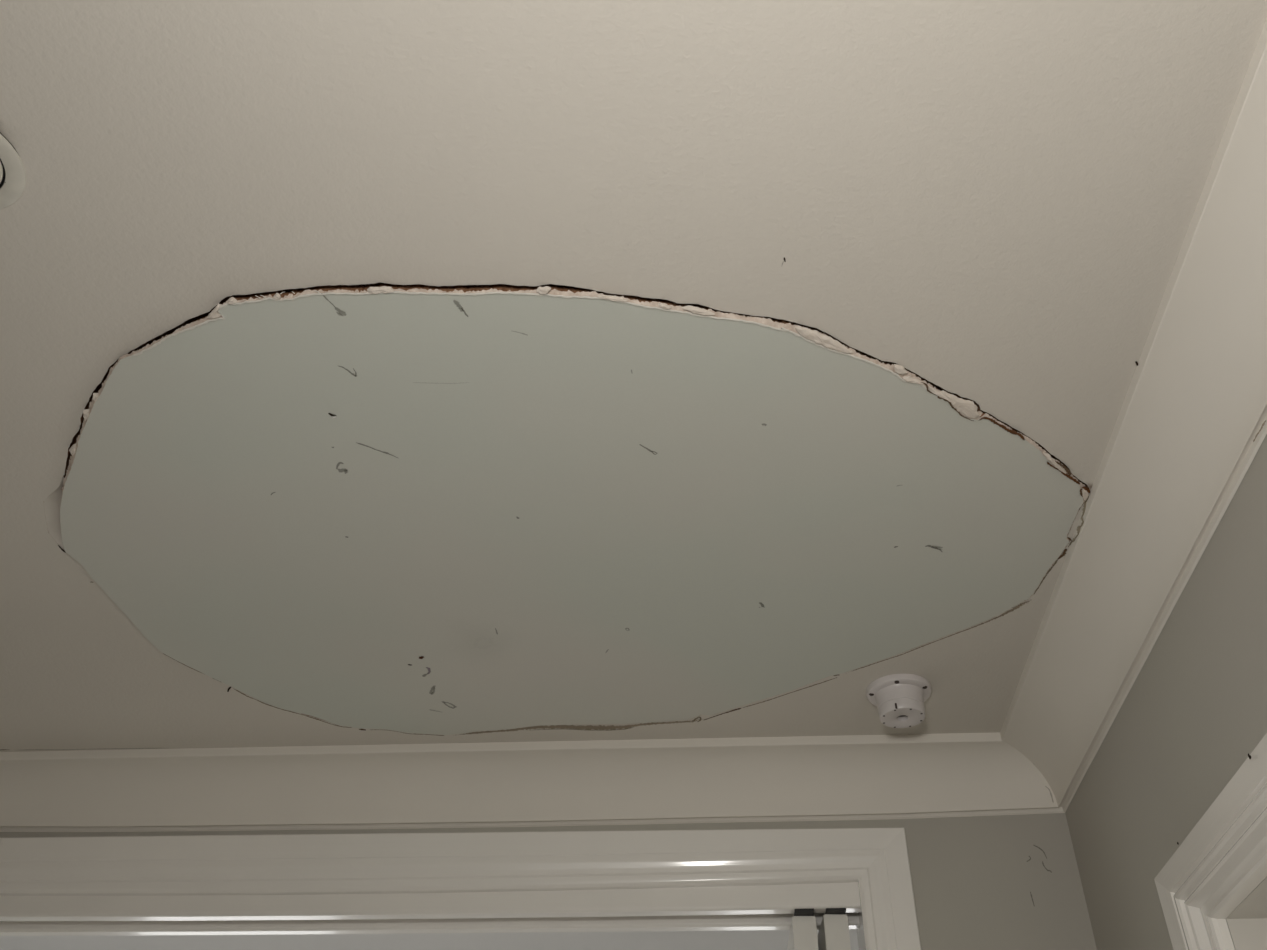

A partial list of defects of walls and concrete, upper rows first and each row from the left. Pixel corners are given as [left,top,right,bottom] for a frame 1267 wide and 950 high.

flaking render [367,286,394,294]